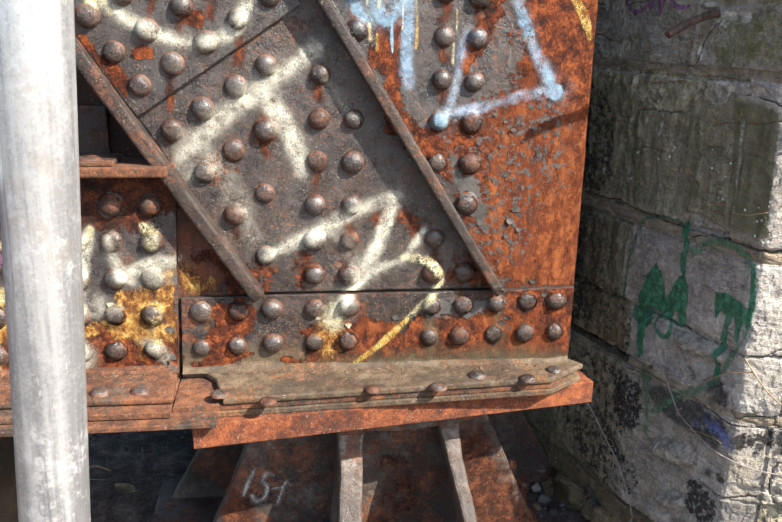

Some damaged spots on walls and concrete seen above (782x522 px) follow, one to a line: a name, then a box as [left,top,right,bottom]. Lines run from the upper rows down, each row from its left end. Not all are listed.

corrosion [281,0,598,363]
peeling [442,71,577,270]
damp [582,82,614,194]
damp [721,102,779,243]
corrosion [0,324,8,353]
damp [571,205,631,358]
corrosion [221,490,255,522]
corrosion [460,422,535,522]
damp [559,348,782,495]